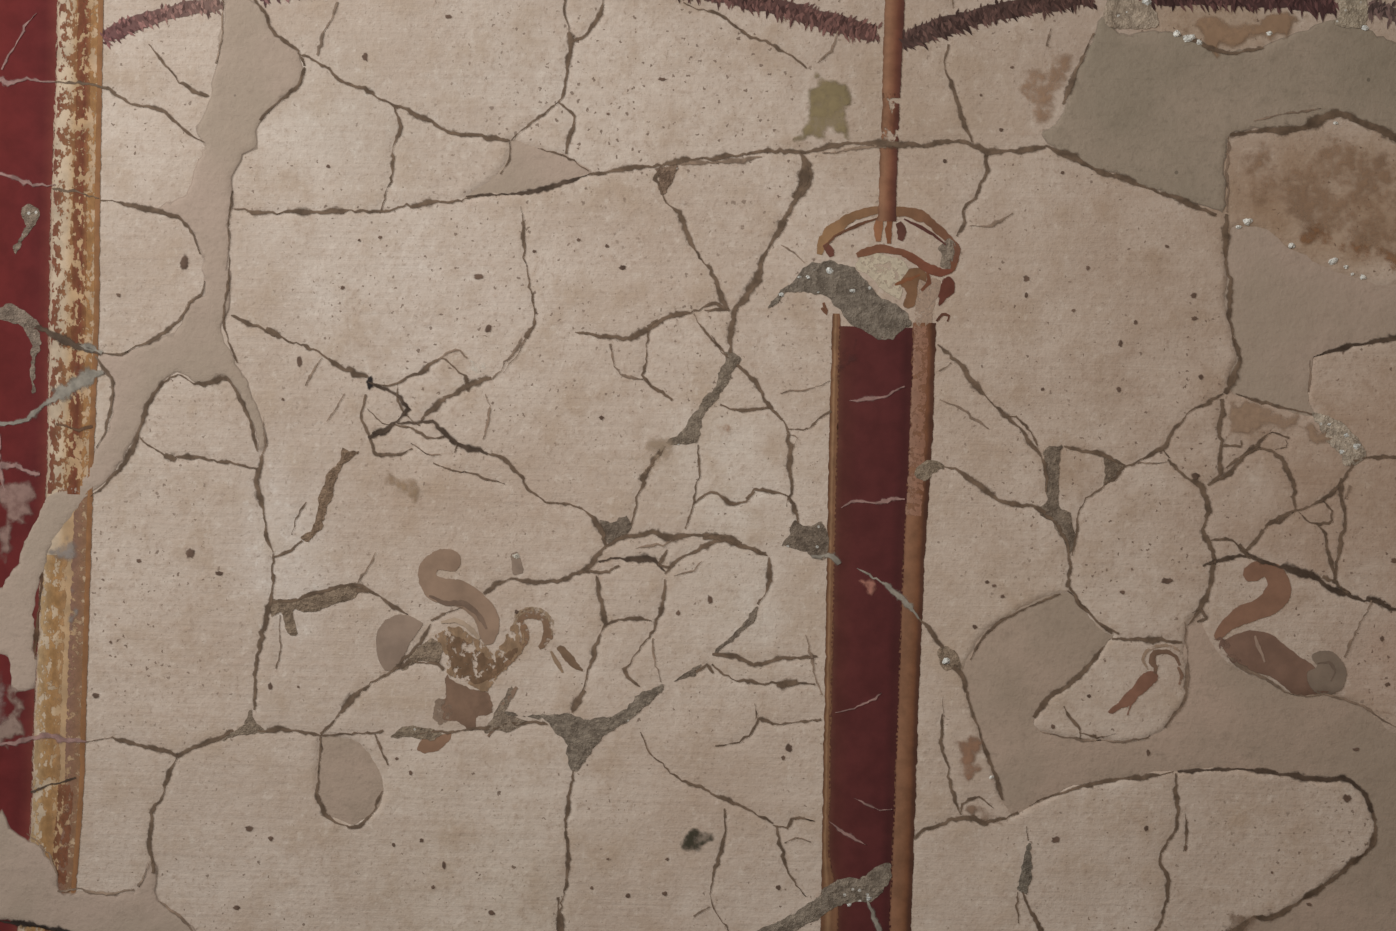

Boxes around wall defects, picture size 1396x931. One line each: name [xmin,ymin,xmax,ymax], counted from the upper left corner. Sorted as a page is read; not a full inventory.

peeling [0,0,78,494]
crack [0,281,205,491]
crack [222,0,1396,747]
flaking render [768,260,912,340]
crack [90,374,408,710]
peeling [31,555,68,860]
crack [0,729,234,931]
crack [258,607,462,829]
flaking render [757,863,892,931]
flaking render [937,646,961,670]
flaking render [1017,843,1032,894]
crack [913,665,1377,931]